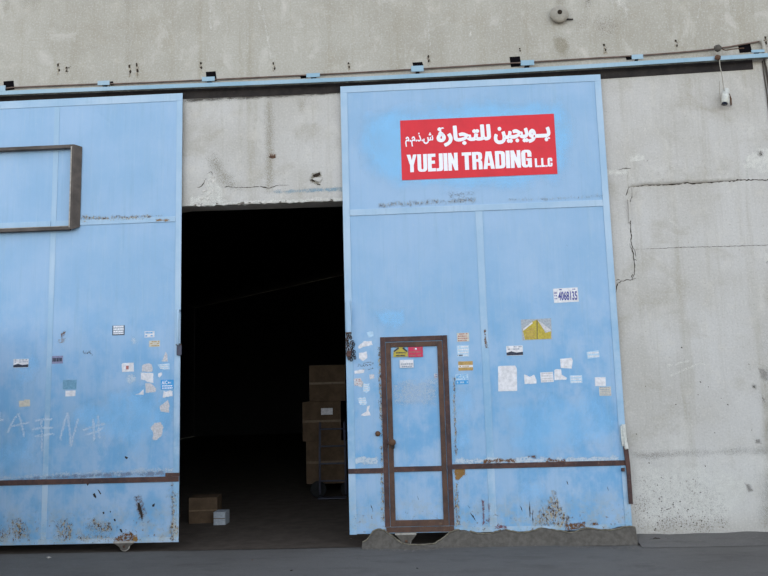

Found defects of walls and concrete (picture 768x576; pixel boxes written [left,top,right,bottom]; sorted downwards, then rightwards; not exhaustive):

spalling [185,171,343,207]
crack [616,168,768,290]
rust [452,377,619,531]
rust [0,467,173,486]
rust [55,511,138,543]
rust [133,496,155,522]
rust [168,484,179,540]